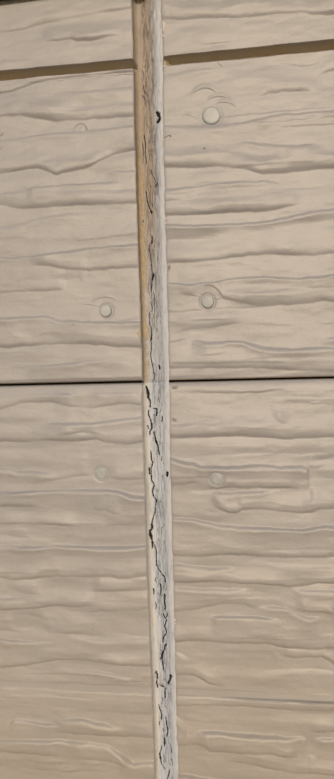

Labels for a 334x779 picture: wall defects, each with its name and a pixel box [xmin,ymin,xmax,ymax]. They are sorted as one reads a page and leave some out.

crack [146,245,173,779]